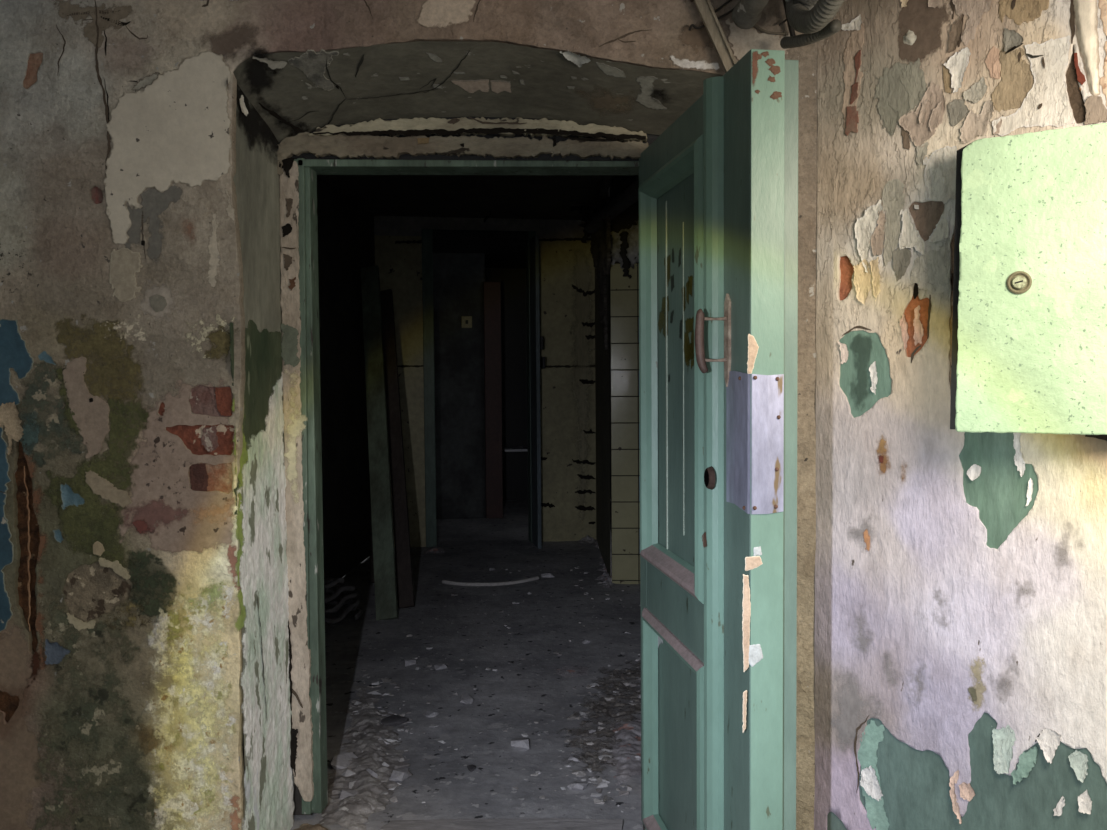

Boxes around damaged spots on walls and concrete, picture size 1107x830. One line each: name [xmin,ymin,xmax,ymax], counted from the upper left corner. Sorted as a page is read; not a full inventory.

crack [56,0,148,177]
crack [259,50,646,141]
crack [599,29,652,47]
peeling [91,50,248,302]
peeling [840,0,1107,383]
peeling [838,326,892,418]
peeling [959,432,1039,549]
peeling [0,319,188,830]
peeling [158,320,307,830]
peeling [827,812,847,830]
peeling [858,712,1107,830]